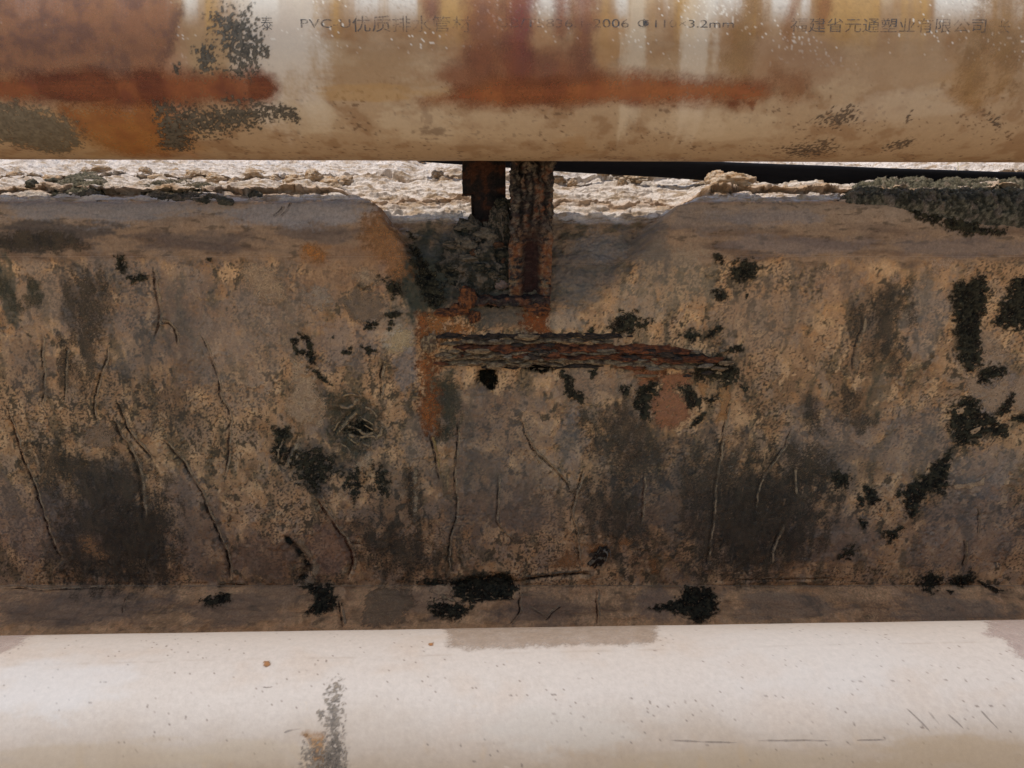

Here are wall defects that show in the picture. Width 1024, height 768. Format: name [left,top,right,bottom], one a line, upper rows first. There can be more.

crack [6,405,63,556]
water stain [20,431,185,597]
crack [152,272,179,343]
crack [93,340,246,587]
crack [285,536,320,586]
crack [409,427,461,568]
spalling [476,369,498,391]
spalling [525,364,556,374]
crack [511,424,601,623]
corrosion [413,285,736,442]
peeling [633,369,692,429]
water stain [573,391,848,587]